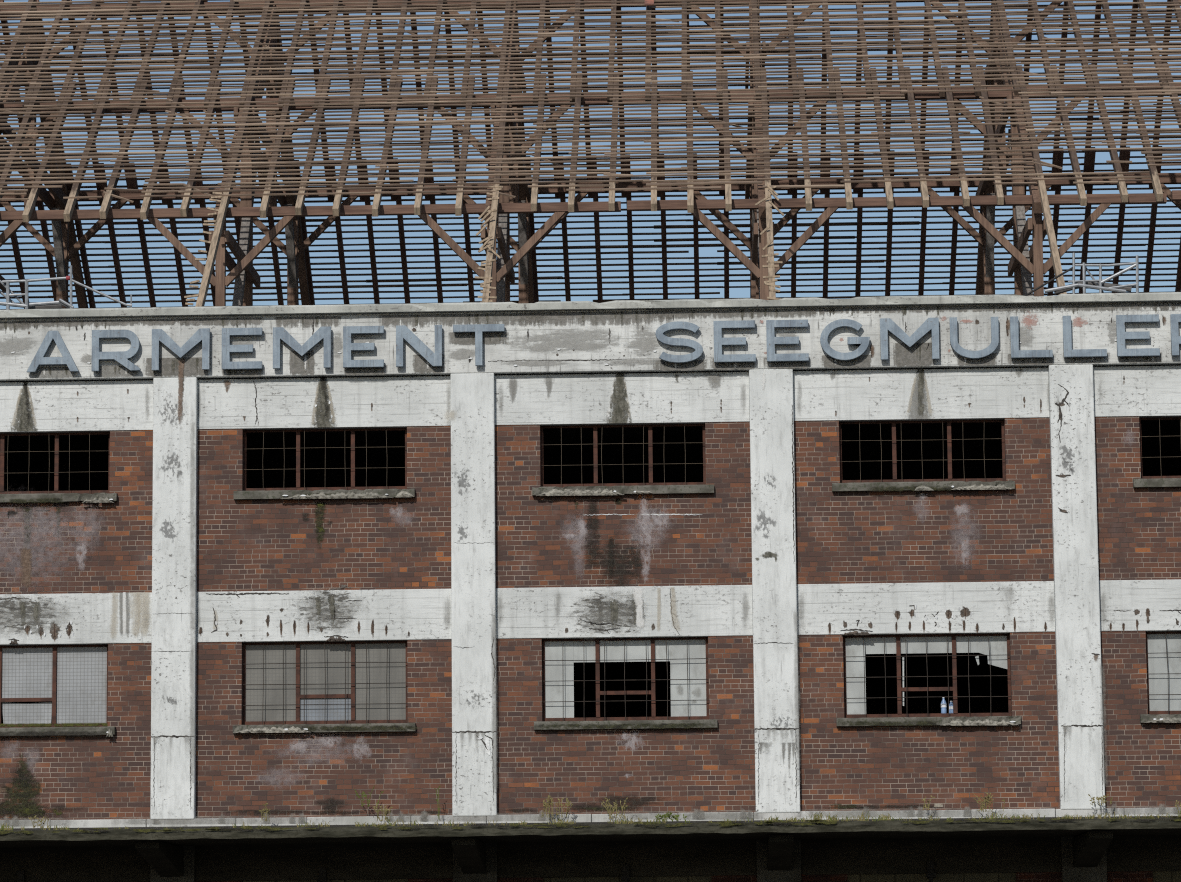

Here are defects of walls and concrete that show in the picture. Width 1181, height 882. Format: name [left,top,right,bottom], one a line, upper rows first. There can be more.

water stain [11,367,74,431]
water stain [289,350,335,427]
water stain [607,373,631,423]
crack [1055,384,1069,443]
water stain [0,597,55,633]
water stain [299,585,353,633]
water stain [571,539,644,637]
water stain [0,755,63,826]